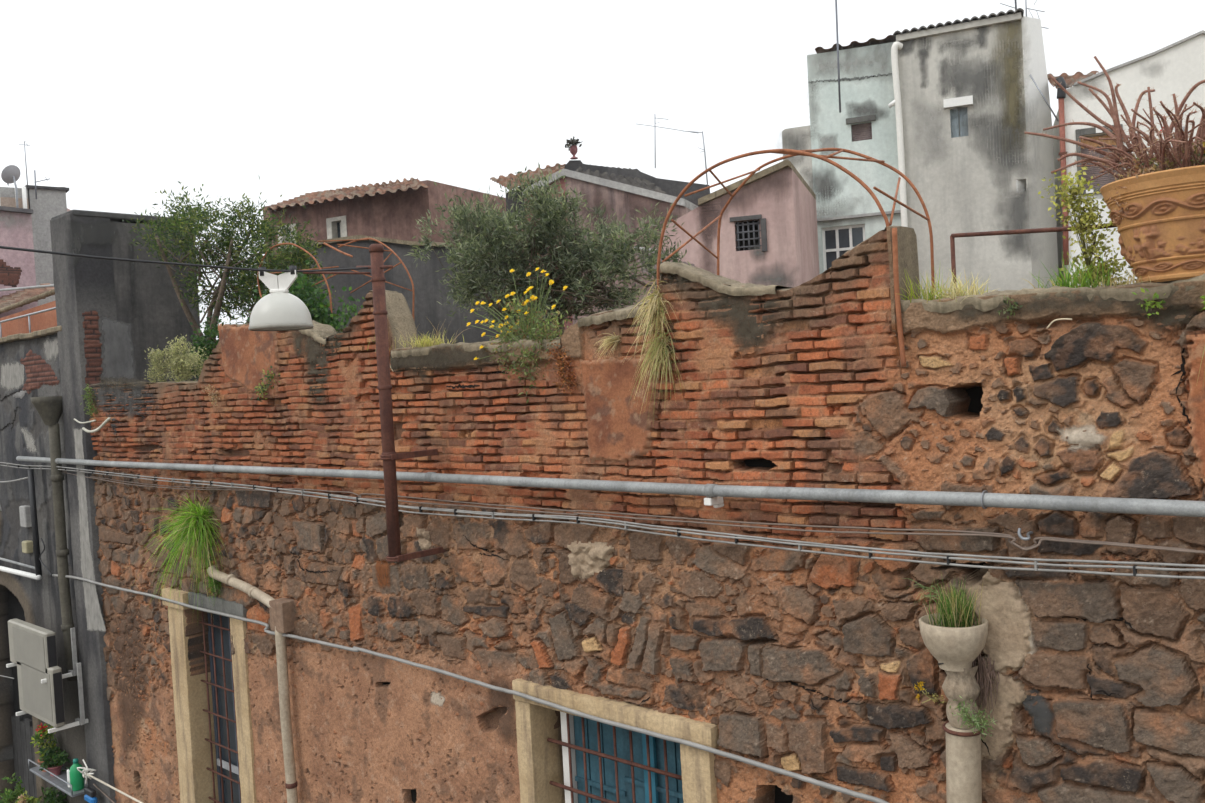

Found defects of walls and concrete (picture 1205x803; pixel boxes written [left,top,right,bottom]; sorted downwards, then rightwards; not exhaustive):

damp [901,37,927,86]
damp [942,19,1026,170]
flaking render [0,259,22,287]
flaking render [1,338,59,399]
crack [1171,348,1192,429]